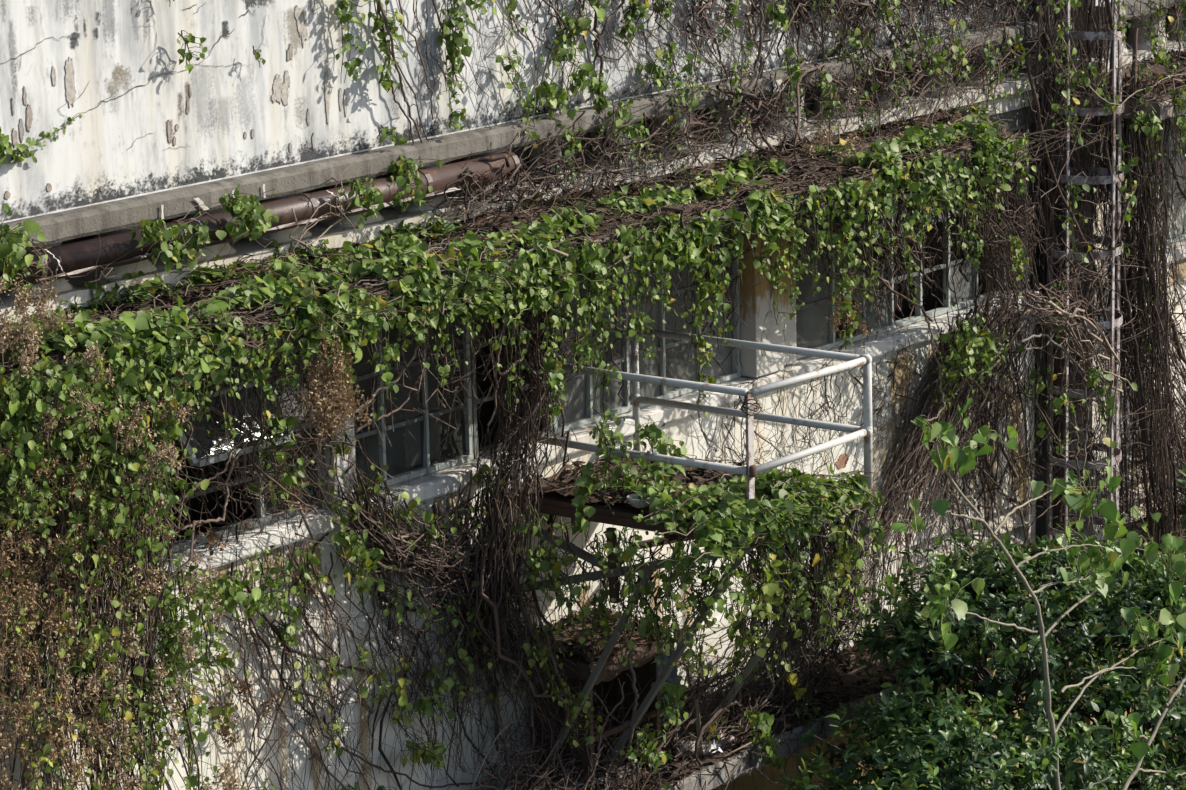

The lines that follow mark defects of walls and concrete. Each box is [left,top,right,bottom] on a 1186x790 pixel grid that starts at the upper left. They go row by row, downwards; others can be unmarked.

crack [0,36,67,71]
crack [58,4,267,120]
flaking render [167,84,192,146]
flaking render [271,0,316,106]
damp [0,9,1030,221]